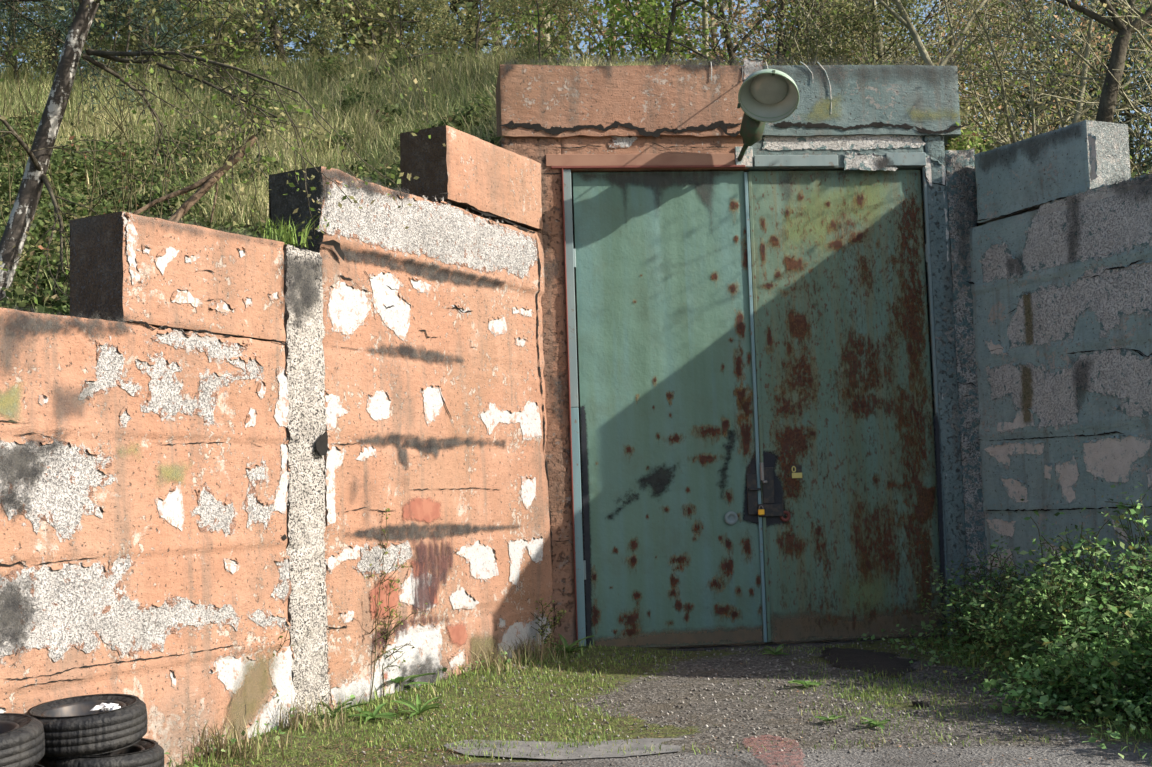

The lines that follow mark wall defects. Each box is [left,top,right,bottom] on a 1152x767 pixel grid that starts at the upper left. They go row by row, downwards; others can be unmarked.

crack [500,120,741,174]
crack [773,121,970,134]
spalling [979,133,1152,506]
peeling [78,321,291,537]
peeling [478,400,542,441]
corrosion [696,312,753,455]
corrosion [734,194,936,629]
peeling [0,432,118,542]
peeling [0,552,297,738]
corrosion [614,592,650,637]
corrosion [670,556,693,624]
corrosion [710,536,761,595]